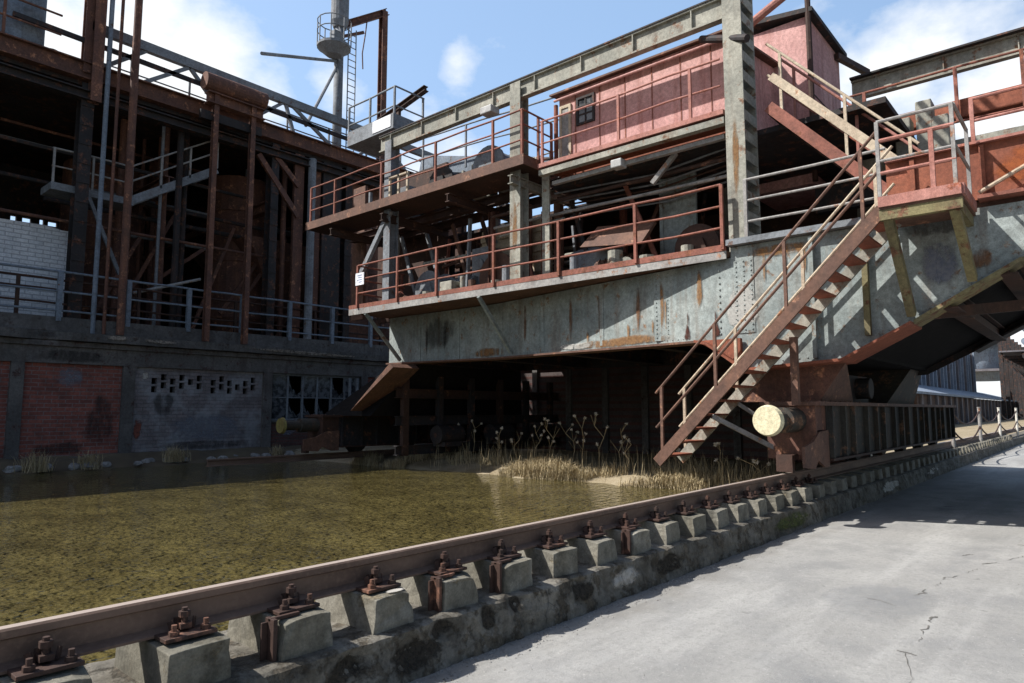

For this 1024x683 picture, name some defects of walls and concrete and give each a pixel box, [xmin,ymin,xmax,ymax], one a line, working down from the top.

rust [585,286,666,348]
water stain [614,568,636,587]